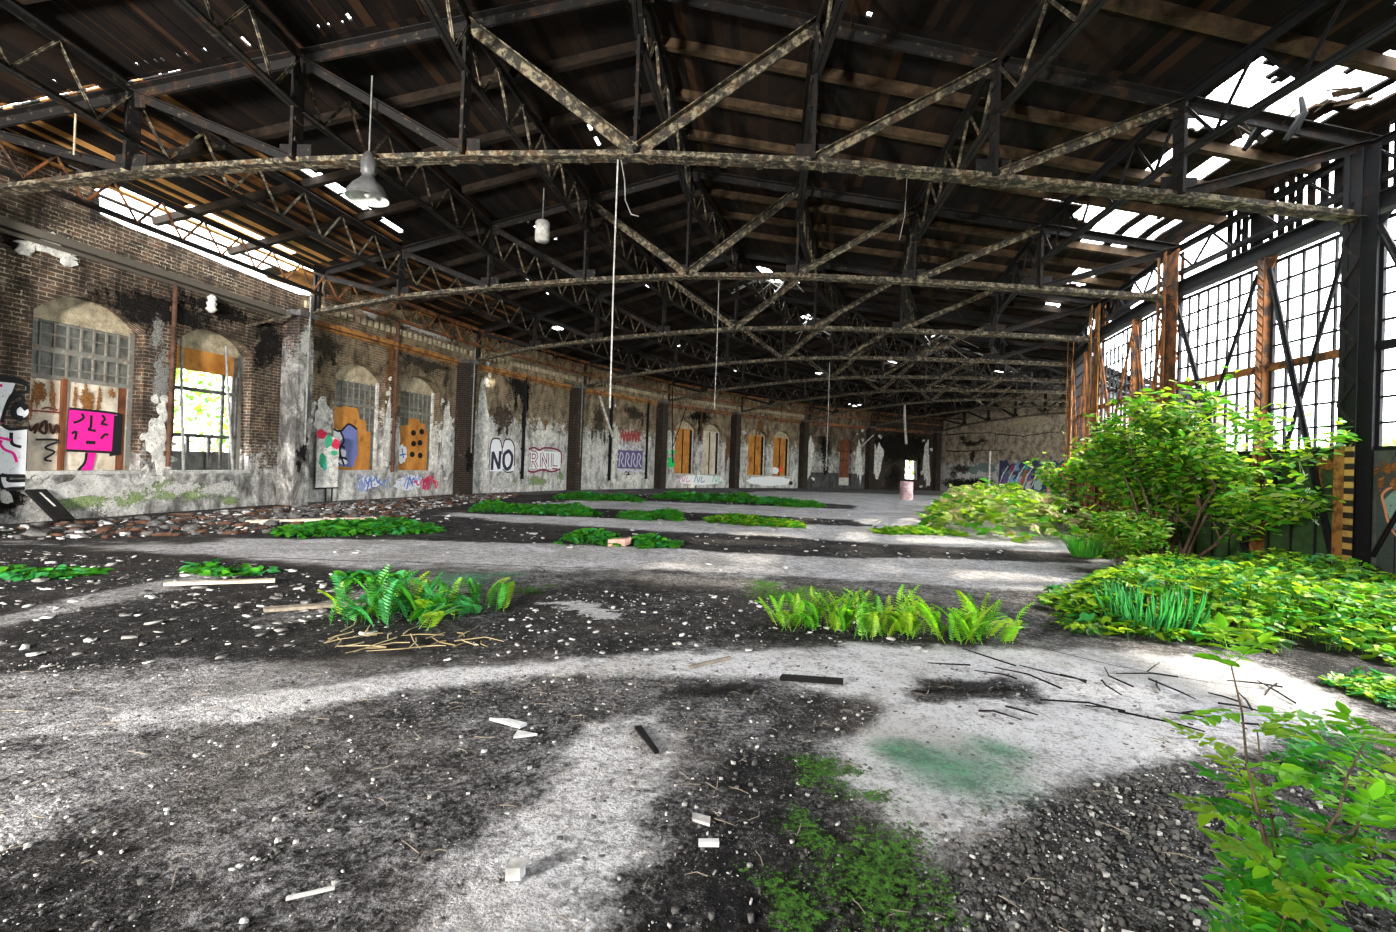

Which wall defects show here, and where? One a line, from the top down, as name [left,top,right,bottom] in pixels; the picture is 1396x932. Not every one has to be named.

peeling [311,396,333,433]
damp [490,377,532,435]